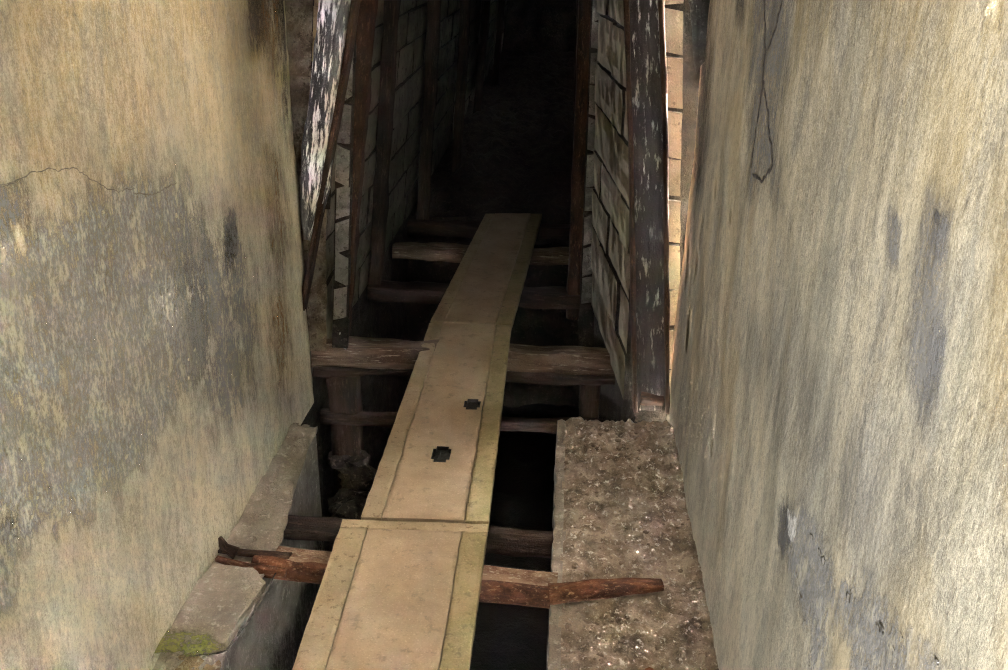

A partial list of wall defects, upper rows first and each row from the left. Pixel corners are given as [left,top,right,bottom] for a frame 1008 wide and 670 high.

crack [749,0,789,200]
crack [0,167,176,238]
water stain [888,213,901,266]
water stain [907,197,948,418]